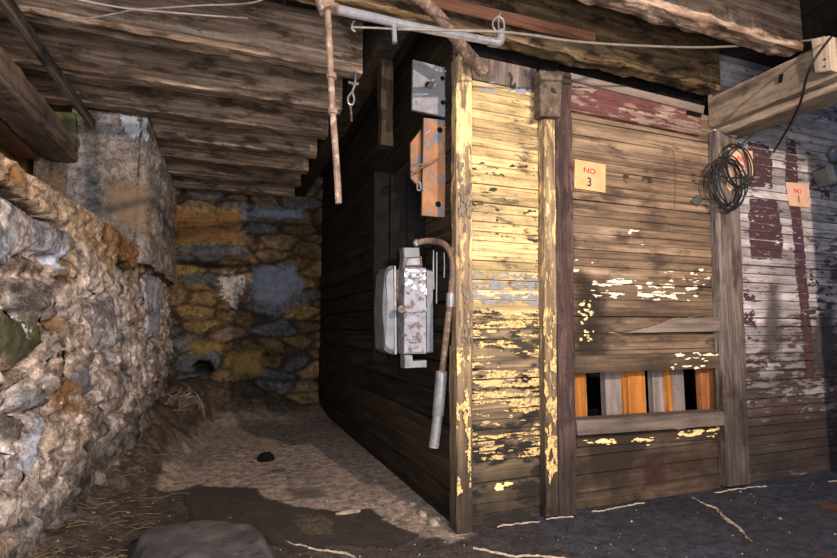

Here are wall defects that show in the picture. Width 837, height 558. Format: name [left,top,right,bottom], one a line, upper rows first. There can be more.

peeling [458,161,506,257]
peeling [578,268,710,341]
peeling [743,289,759,342]
peeling [796,271,833,321]
peeling [456,263,558,495]
peeling [674,426,719,439]
crack [692,486,767,542]